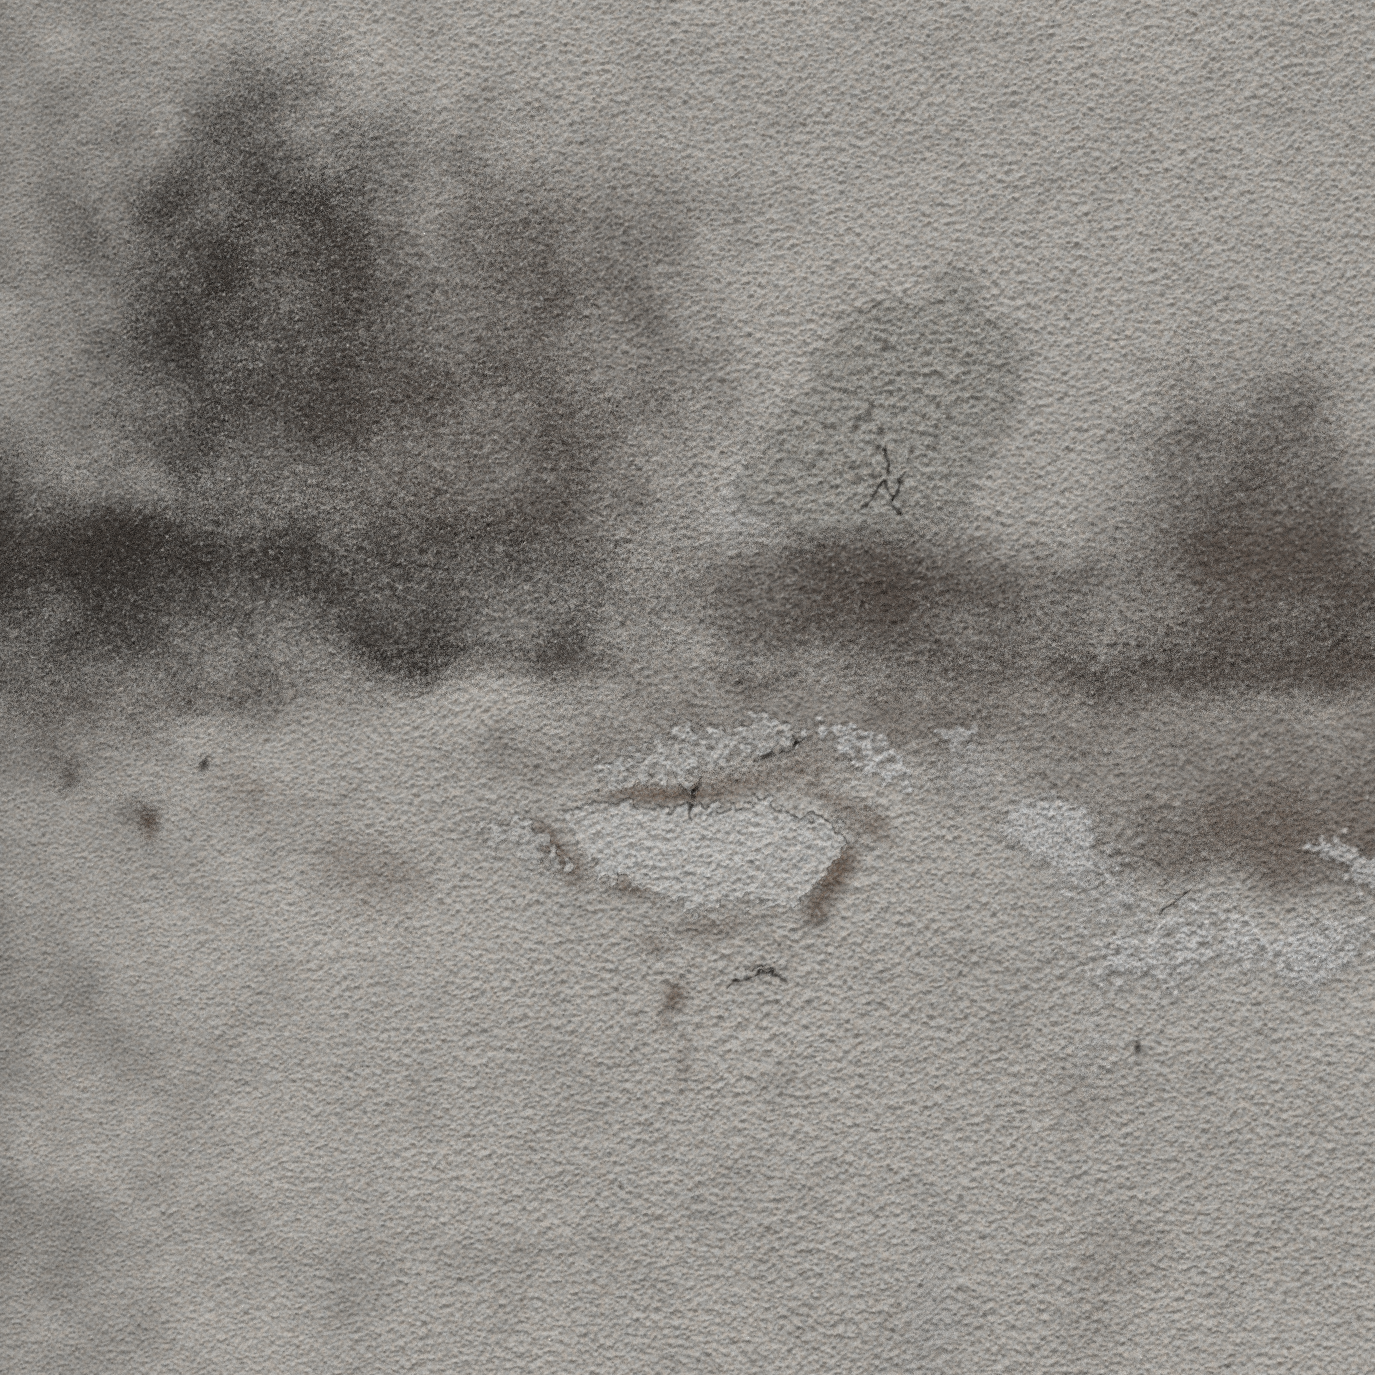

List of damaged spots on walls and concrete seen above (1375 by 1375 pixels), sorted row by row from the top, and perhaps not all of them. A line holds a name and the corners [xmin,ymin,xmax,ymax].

spalling [471,711,913,919]
peeling [935,726,977,749]